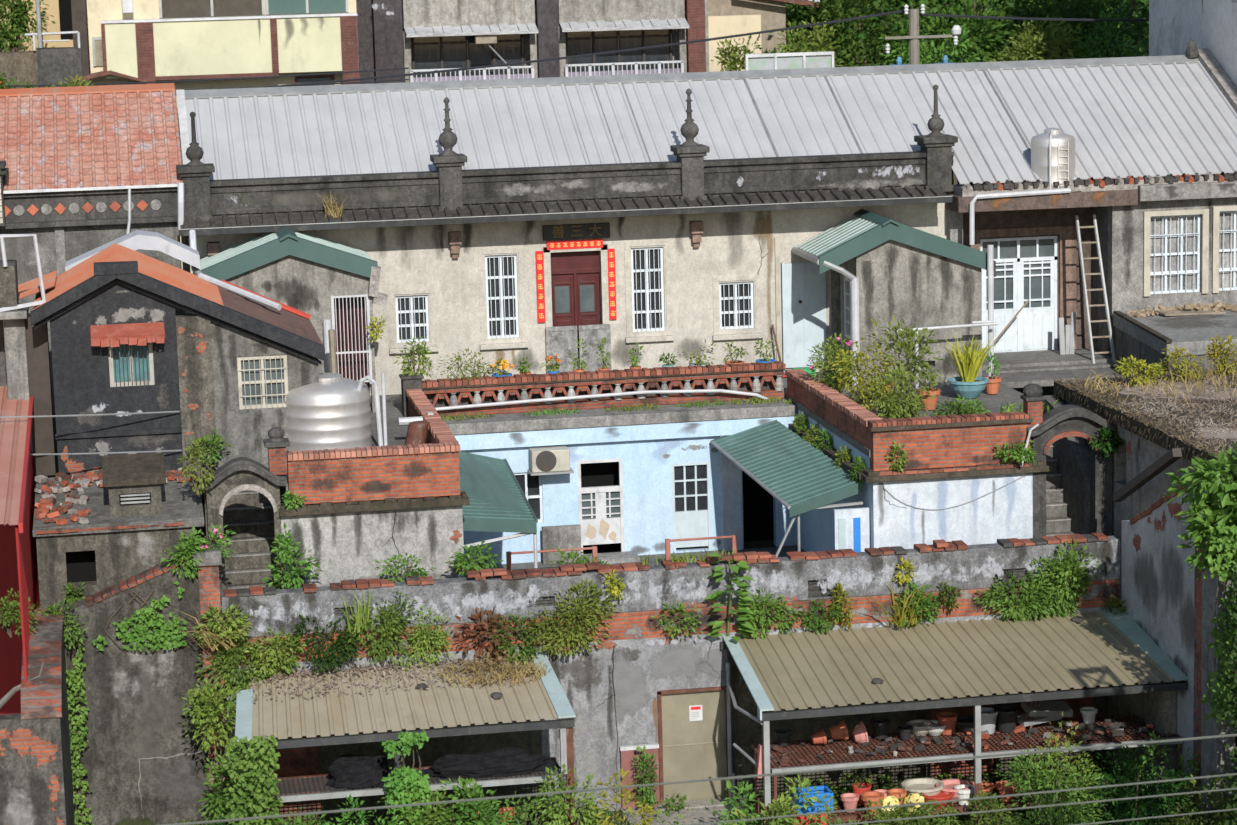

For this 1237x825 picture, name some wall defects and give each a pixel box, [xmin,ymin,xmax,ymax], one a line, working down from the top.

peeling [858,165,920,178]
peeling [96,307,164,325]
water stain [863,261,873,325]
water stain [887,246,896,315]
water stain [913,257,972,329]
flaking render [178,326,214,421]
water stain [942,346,977,373]
water stain [363,481,388,493]
water stain [378,512,437,551]
peeling [241,600,334,632]
peeling [356,584,551,640]
water stain [1048,542,1194,645]